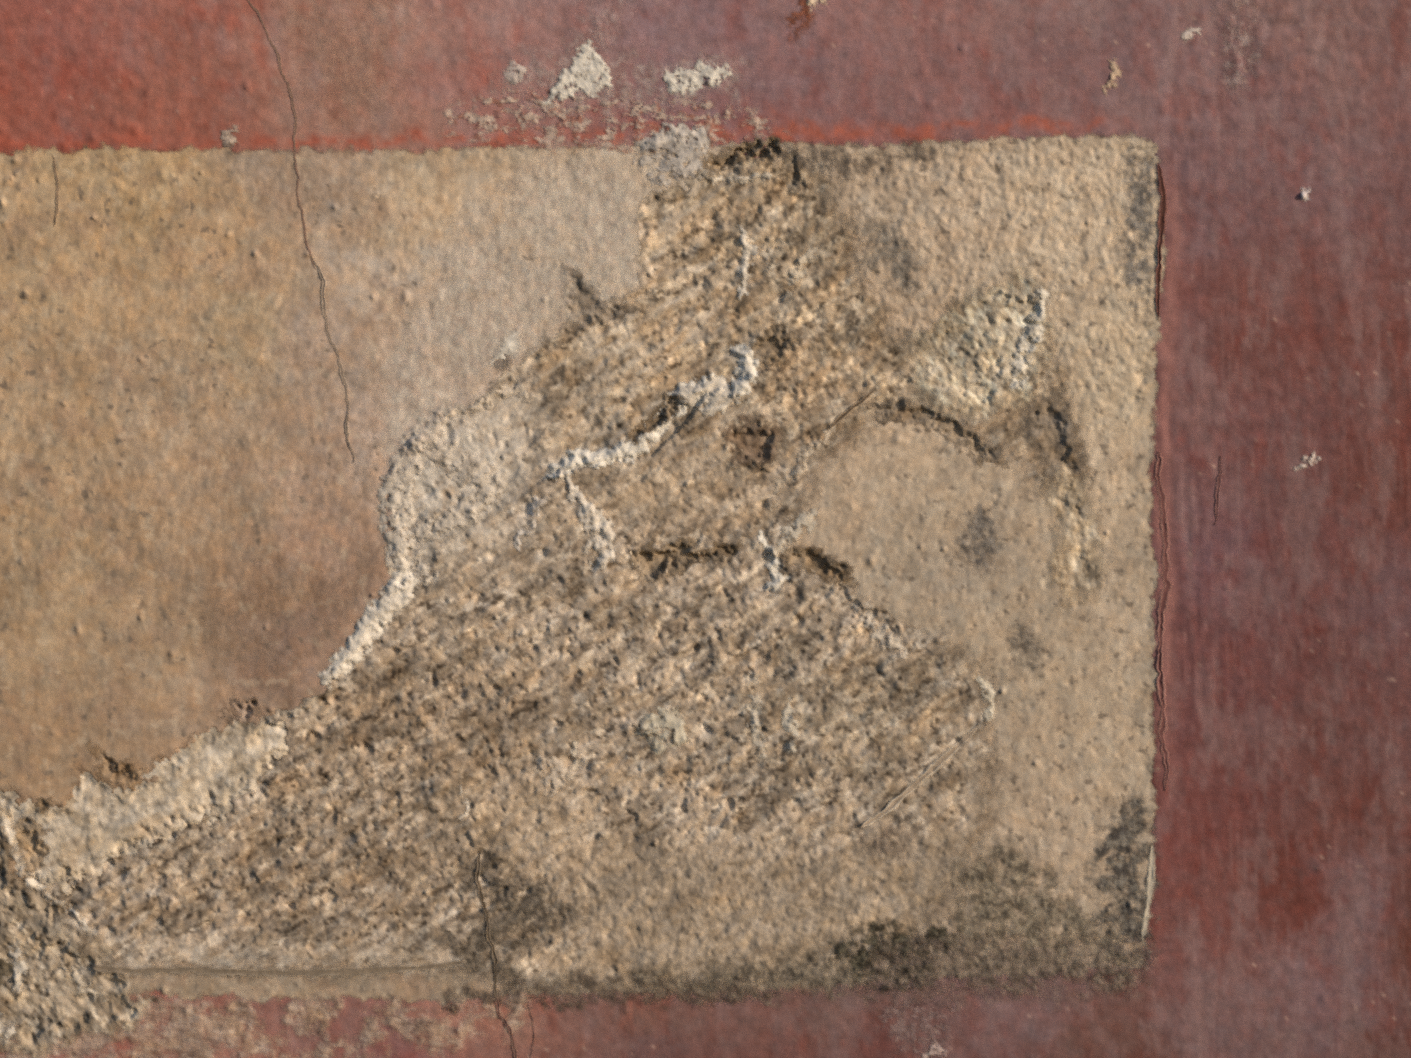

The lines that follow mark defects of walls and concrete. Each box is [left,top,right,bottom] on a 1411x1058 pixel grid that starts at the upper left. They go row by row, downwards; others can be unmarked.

crack [248,0,355,461]
spalling [0,40,1104,993]
peeling [61,963,108,1002]
peeling [0,1013,16,1040]
peeling [922,1043,946,1058]